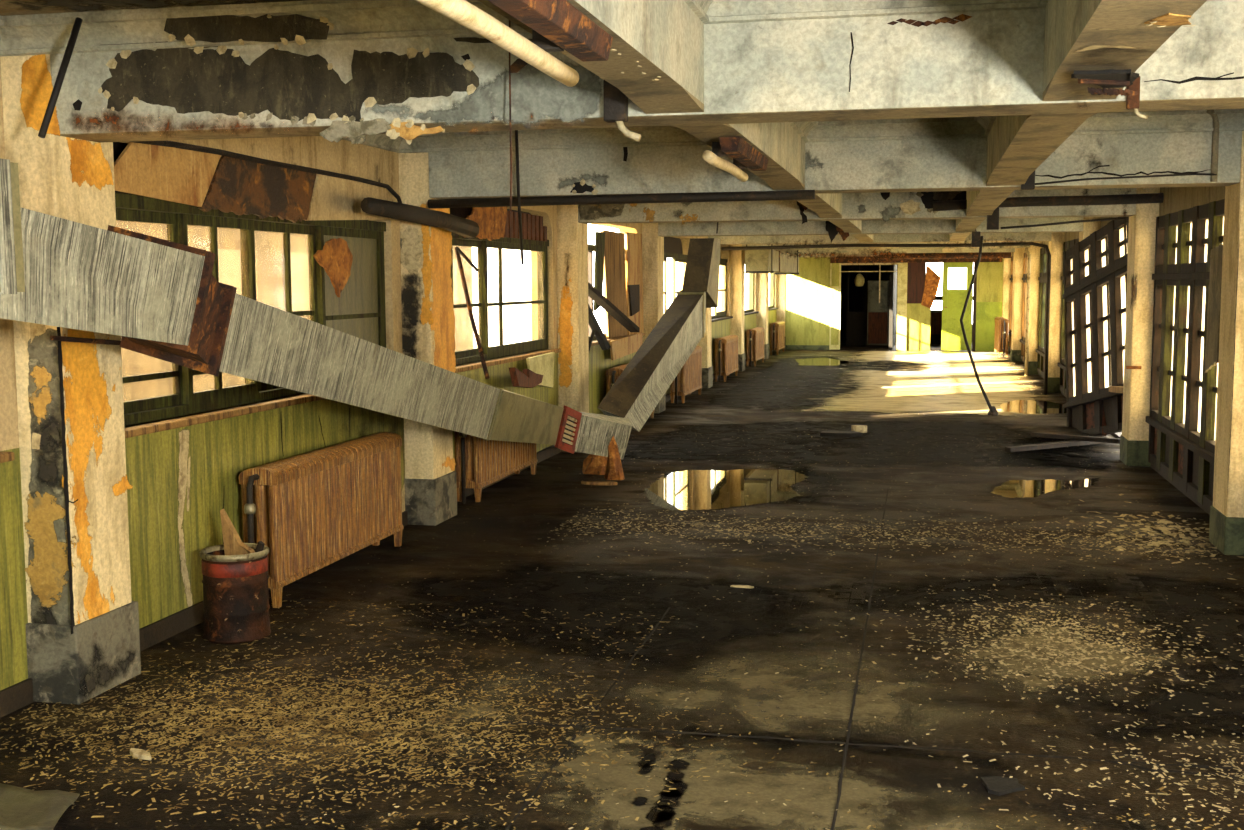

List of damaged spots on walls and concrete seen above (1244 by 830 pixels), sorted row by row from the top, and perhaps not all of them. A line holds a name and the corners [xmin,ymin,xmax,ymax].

peeling [20,54,114,190]
flaking render [98,14,493,145]
peeling [511,58,528,73]
crack [1035,165,1207,179]
crack [1144,72,1244,84]
crack [1227,227,1240,495]
peeling [24,328,121,624]
peeling [112,475,133,496]